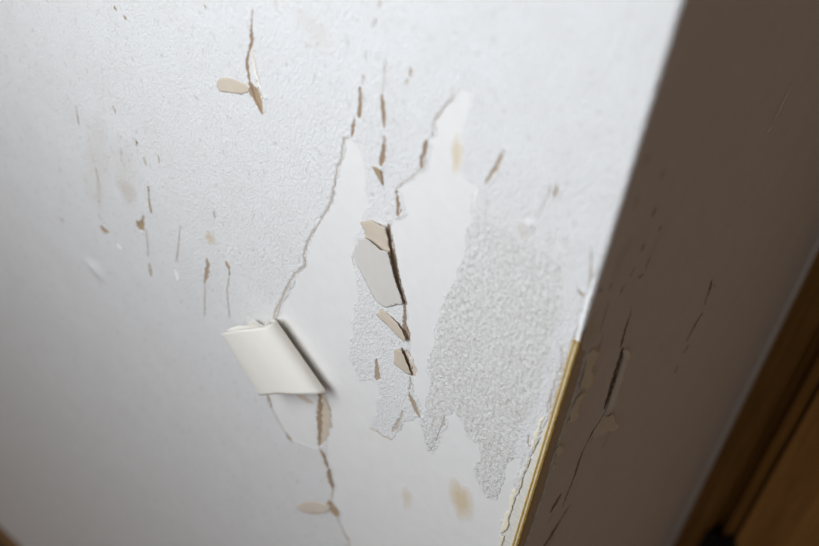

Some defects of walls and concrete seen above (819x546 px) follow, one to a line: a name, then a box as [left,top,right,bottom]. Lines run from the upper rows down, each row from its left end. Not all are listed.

crack [217,10,263,115]
peeling [268,90,569,546]
crack [267,395,293,443]
crack [296,393,350,546]
peeling [563,308,632,506]